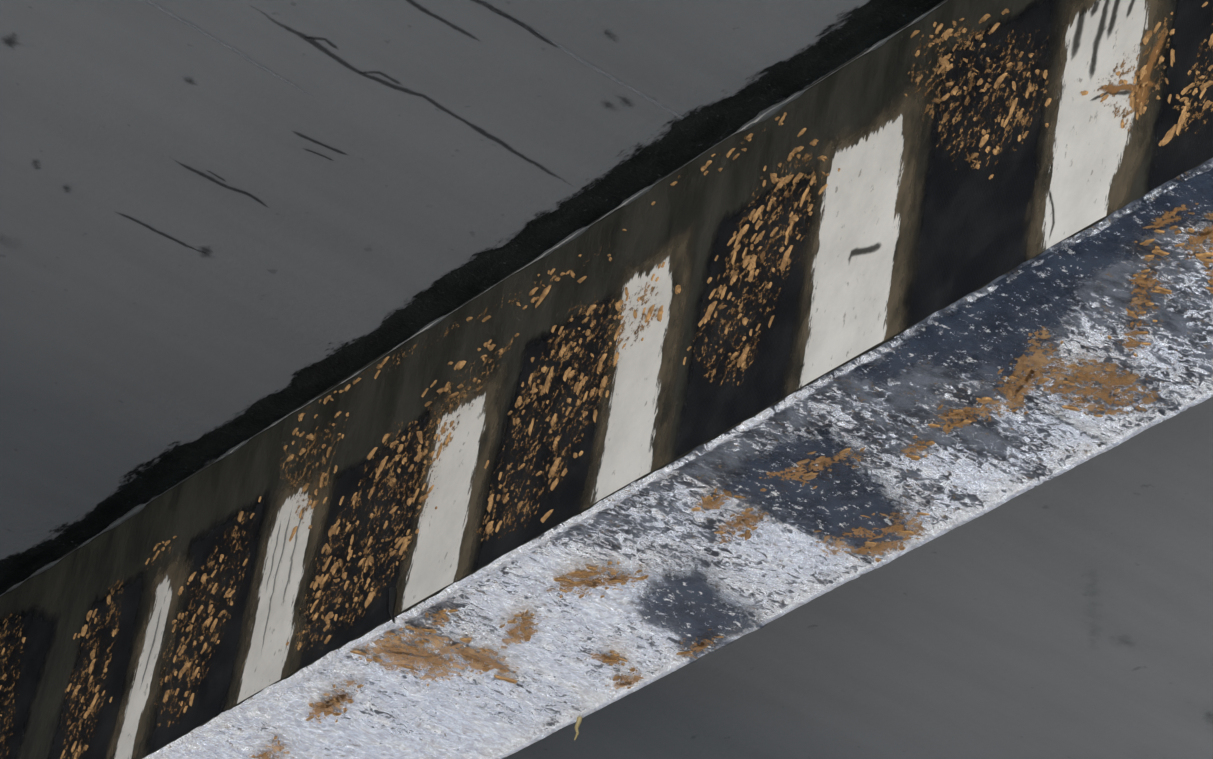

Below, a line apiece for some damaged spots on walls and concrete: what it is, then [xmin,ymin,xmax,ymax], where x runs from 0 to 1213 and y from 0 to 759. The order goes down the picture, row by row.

crack [181,164,263,204]
crack [271,19,553,175]
crack [407,0,474,38]
rust [276,254,612,651]
damp [394,374,503,616]
crack [473,0,553,45]
rust [476,262,665,541]
damp [584,231,691,508]
rust [683,128,840,385]
damp [789,87,927,393]
rust [904,8,1052,179]
damp [1028,0,1165,257]